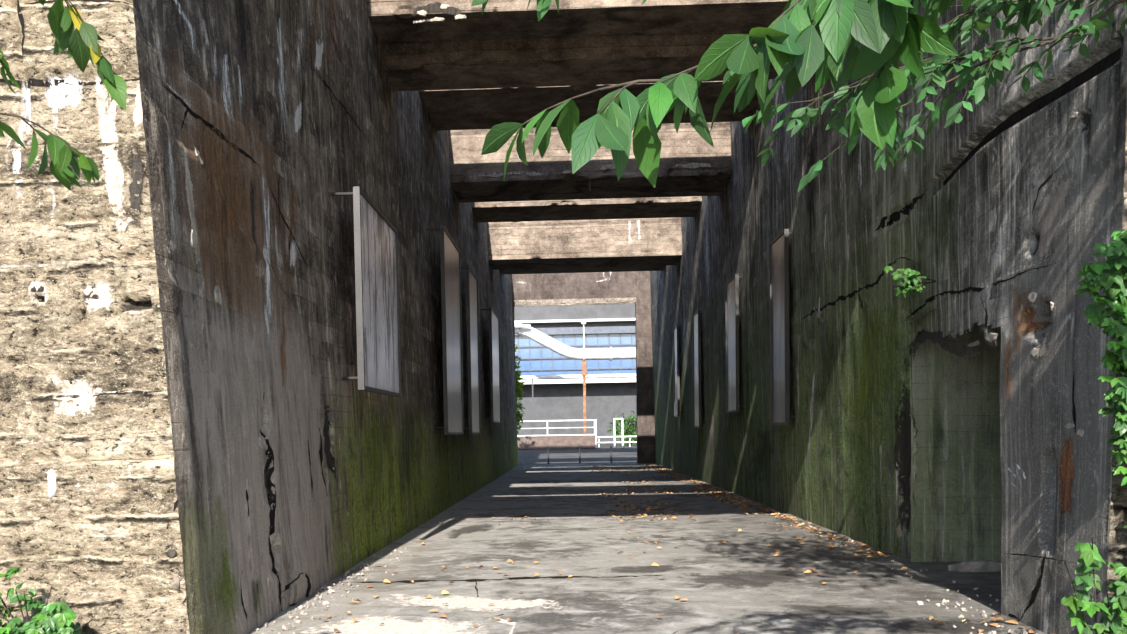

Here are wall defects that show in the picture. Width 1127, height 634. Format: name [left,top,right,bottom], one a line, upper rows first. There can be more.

damp [7,84,31,183]
damp [45,74,82,121]
crack [0,0,309,271]
crack [875,188,928,231]
crack [802,257,924,319]
crack [906,263,1055,336]
corrosion [1059,374,1084,514]
crack [240,395,311,619]
damp [451,524,490,538]
crack [1003,553,1076,621]